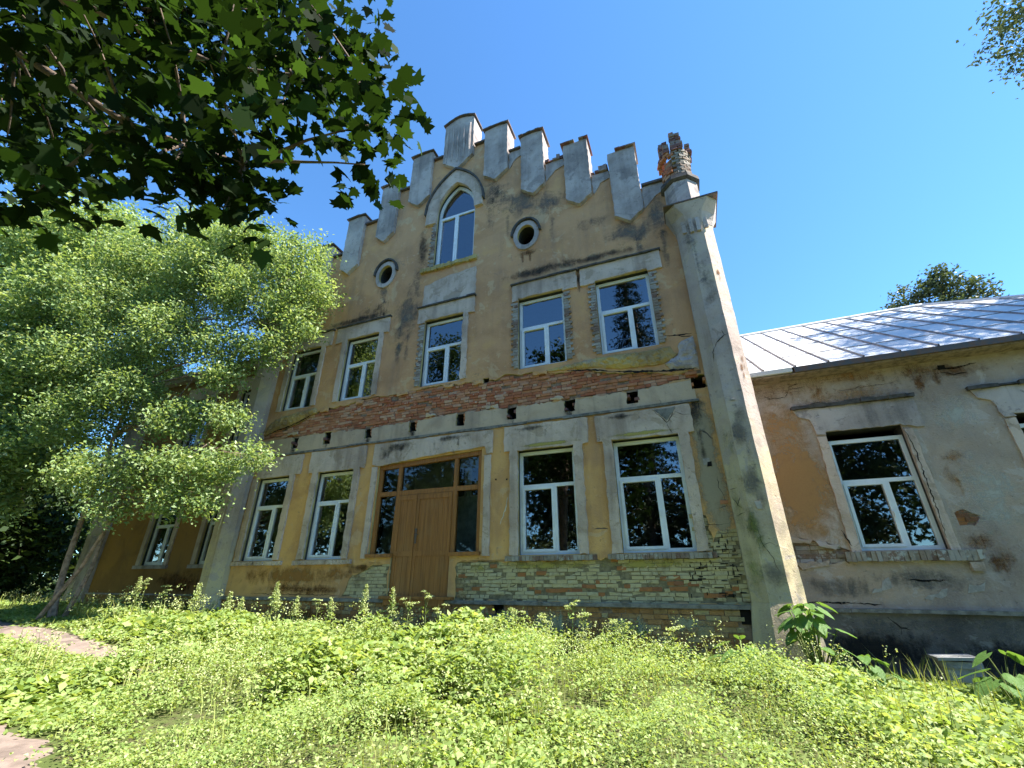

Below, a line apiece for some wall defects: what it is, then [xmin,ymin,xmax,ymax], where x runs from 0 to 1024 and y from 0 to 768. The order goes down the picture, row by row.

leakage [512,202,665,303]
spalling [264,285,701,440]
peeling [455,402,751,605]
peeling [764,411,849,570]
spalling [955,510,979,526]
leakage [834,633,933,668]
leakage [972,643,1024,676]